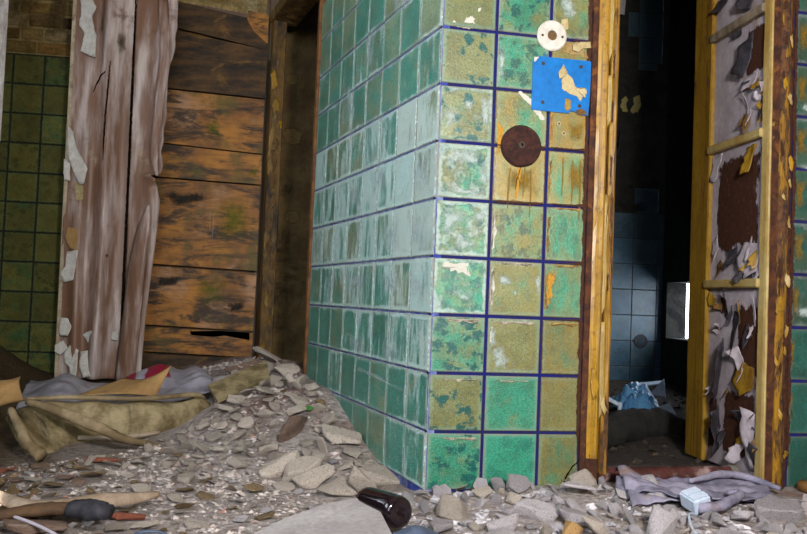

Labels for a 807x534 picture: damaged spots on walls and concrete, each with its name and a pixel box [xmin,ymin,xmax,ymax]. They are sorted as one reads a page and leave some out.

peeling [709,0,753,14]
peeling [730,24,765,134]
corrosion [496,167,542,216]
corrosion [541,0,600,471]
corrosion [770,0,807,489]